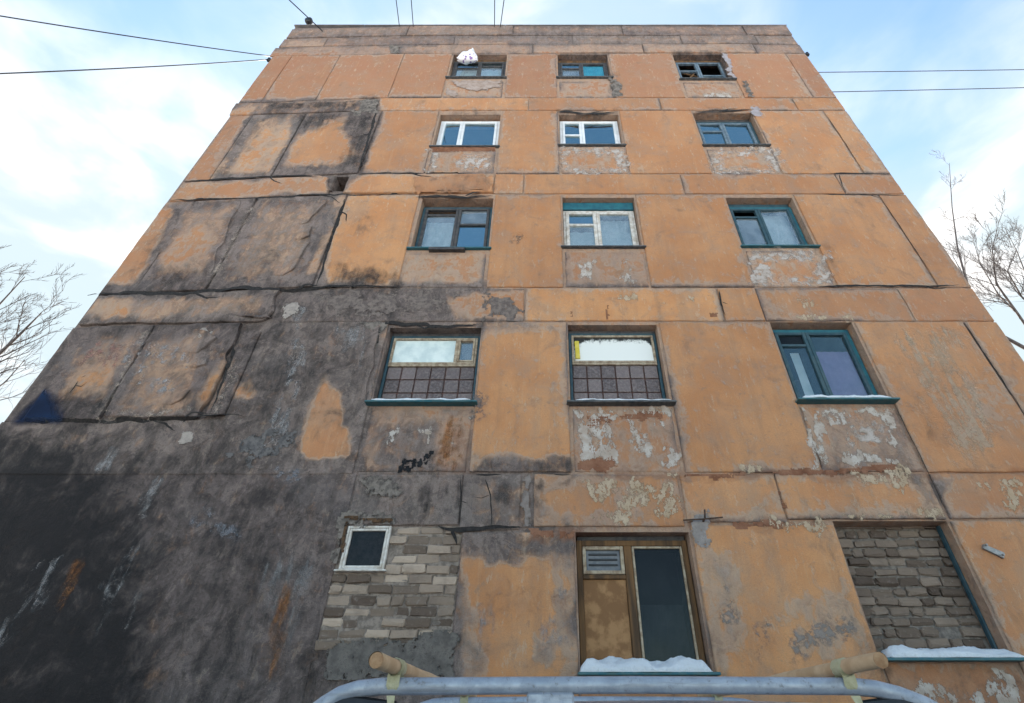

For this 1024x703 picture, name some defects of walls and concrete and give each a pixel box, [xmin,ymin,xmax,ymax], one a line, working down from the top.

crack [87,109,491,299]
spalling [311,286,460,348]
spalling [479,292,525,322]
crack [439,474,519,544]
flaking render [573,405,682,526]
peeling [801,407,820,469]
flaking render [850,463,912,495]
flaking render [976,477,1024,521]
peeling [912,668,1021,703]